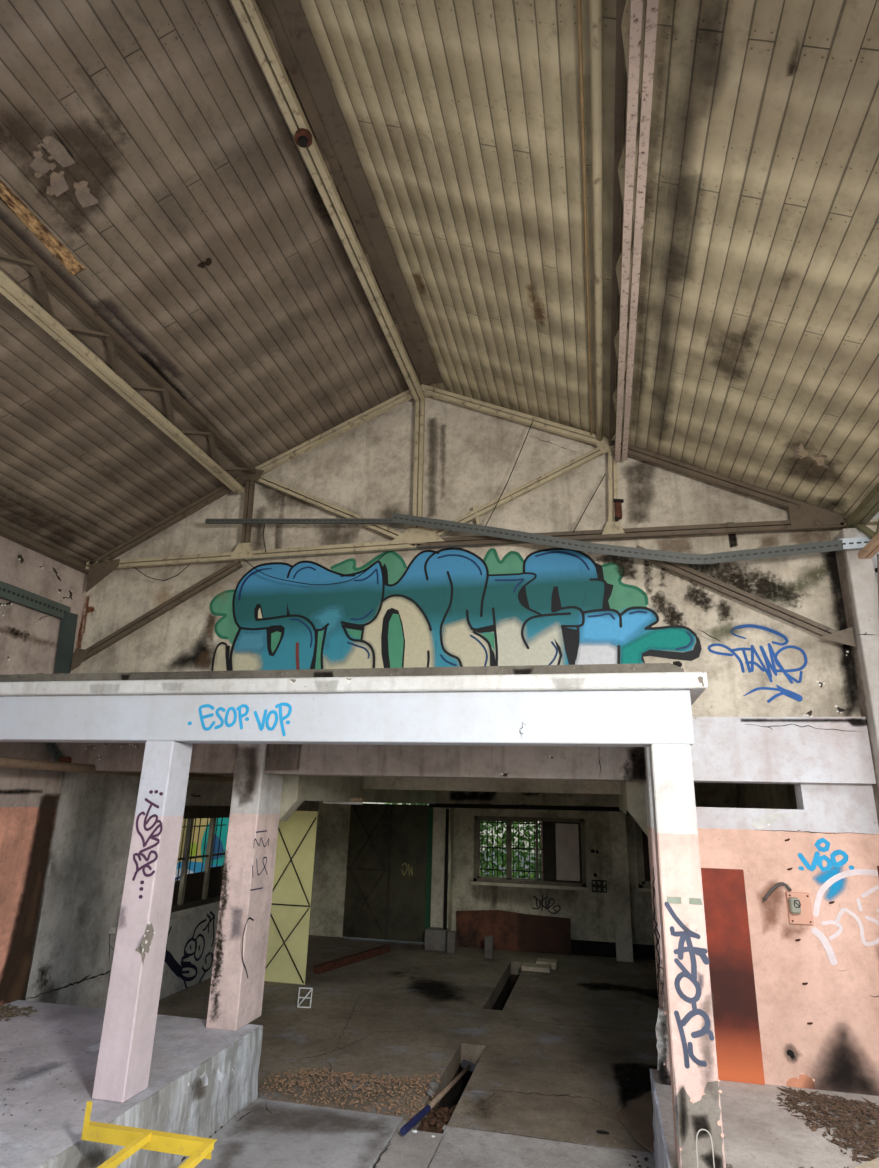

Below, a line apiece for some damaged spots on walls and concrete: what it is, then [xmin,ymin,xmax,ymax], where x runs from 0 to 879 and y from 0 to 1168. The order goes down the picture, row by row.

leakage [0,120,113,228]
peeling [30,136,99,207]
leakage [594,555,682,625]
leakage [686,585,735,639]
leakage [680,551,841,607]
leakage [845,645,868,726]
leakage [211,850,227,1018]
peeling [624,1007,668,1107]